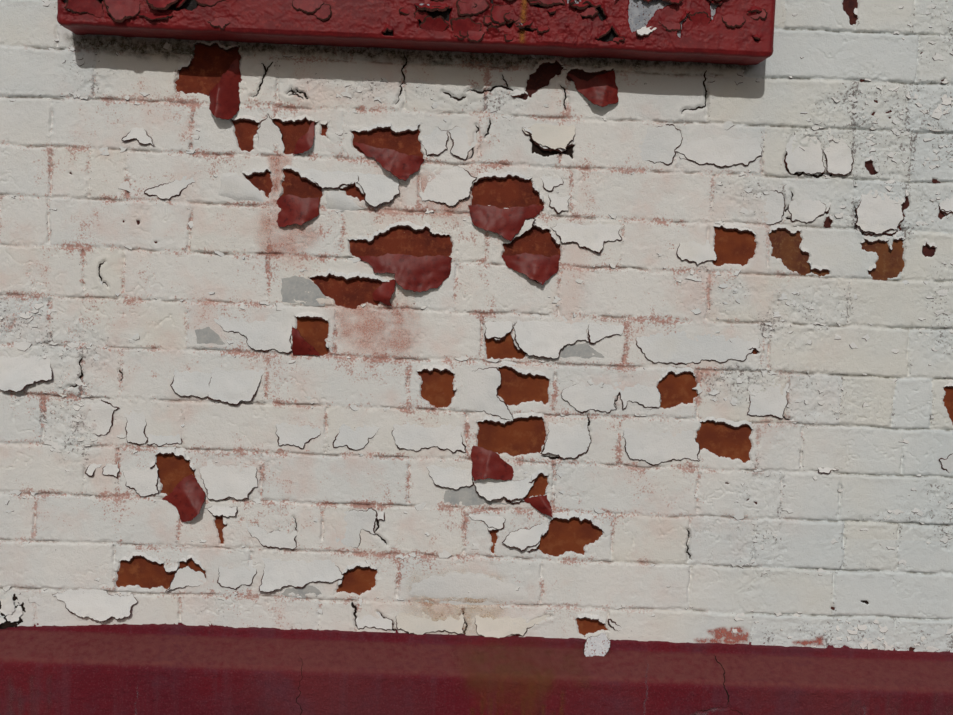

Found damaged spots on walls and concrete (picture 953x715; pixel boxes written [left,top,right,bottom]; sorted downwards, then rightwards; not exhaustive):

peeling [842,0,858,25]
peeling [633,118,763,176]
peeling [170,17,624,405]
peeling [675,78,953,304]
peeling [0,303,261,544]
peeling [275,422,321,449]
peeling [392,291,872,565]
peeling [943,377,953,425]
peeling [334,508,385,548]
peeling [0,523,555,638]
peeling [576,603,637,657]
peeling [824,607,894,650]